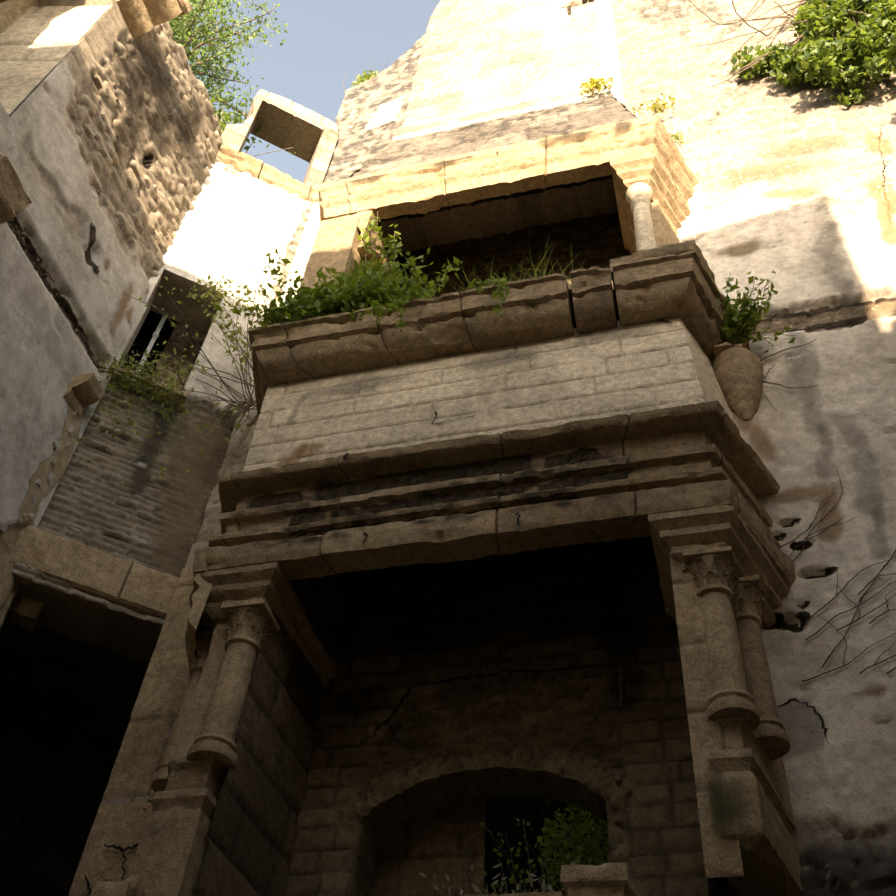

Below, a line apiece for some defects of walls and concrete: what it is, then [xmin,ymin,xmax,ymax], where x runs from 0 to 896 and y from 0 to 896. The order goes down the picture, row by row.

crack [878,128,893,192]
peeling [0,406,91,576]
spalling [773,518,813,551]
spalling [805,566,837,579]
peeling [0,583,18,626]
spalling [761,600,811,633]
crack [335,663,611,751]